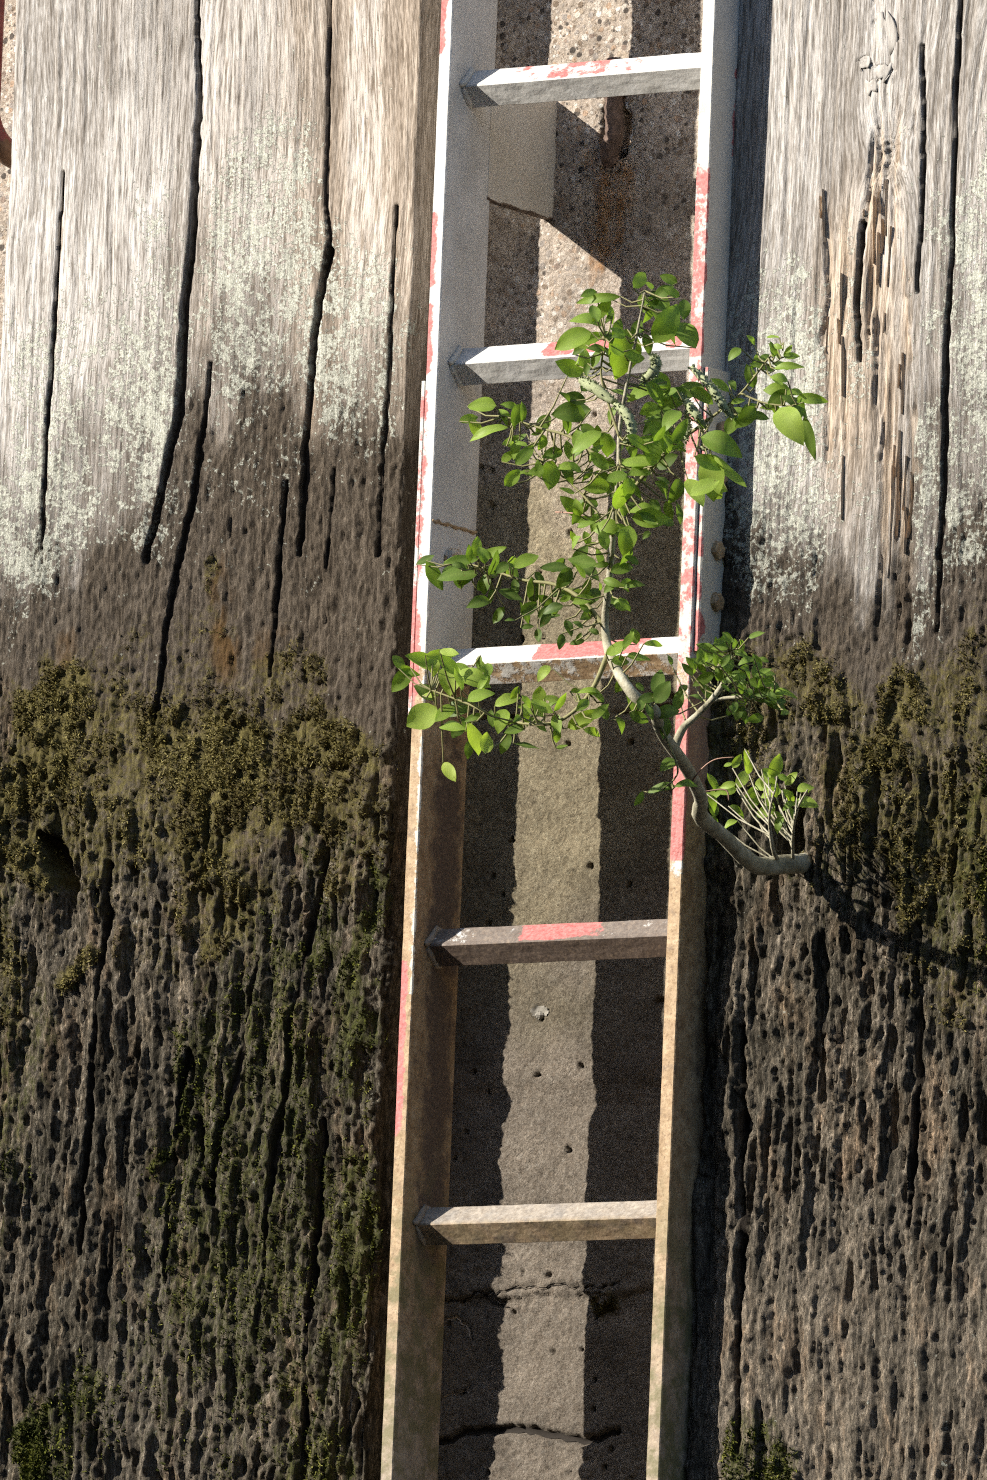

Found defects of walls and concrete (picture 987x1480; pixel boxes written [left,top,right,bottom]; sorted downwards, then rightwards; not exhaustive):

crack [445,1282,620,1339]